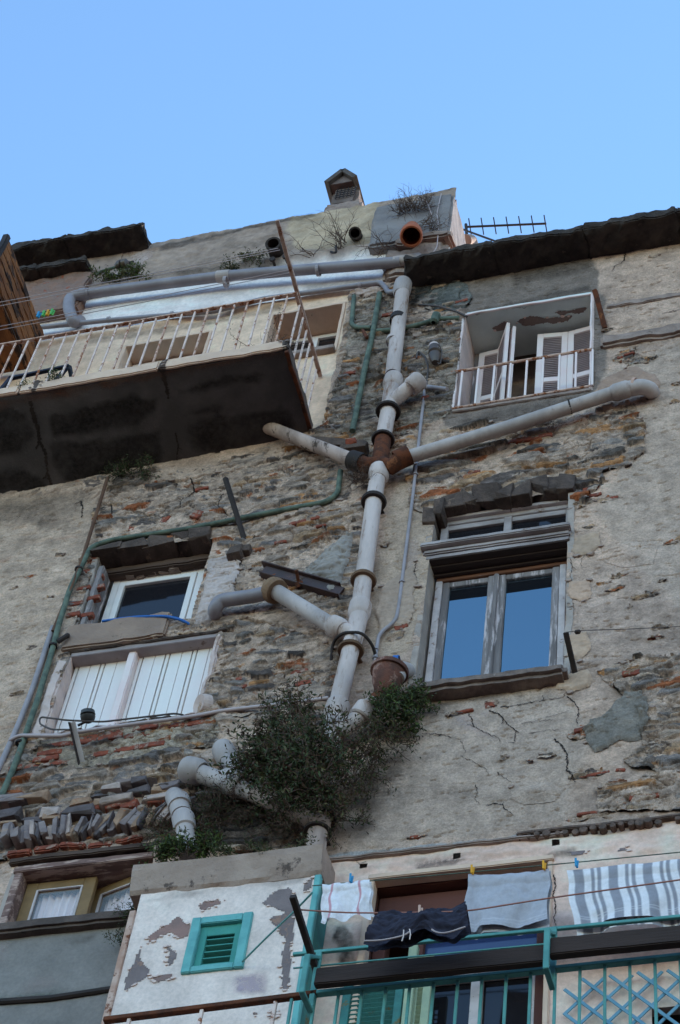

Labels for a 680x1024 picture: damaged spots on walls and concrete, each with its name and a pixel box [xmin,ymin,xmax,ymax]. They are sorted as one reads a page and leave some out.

peeling [492,307,587,332]
crack [28,401,53,485]
flaking render [403,398,648,512]
flaking render [91,454,357,584]
crack [422,692,579,813]
flaking render [564,652,680,823]
peeling [124,917,190,991]
peeling [198,898,225,912]
peeling [262,875,315,991]